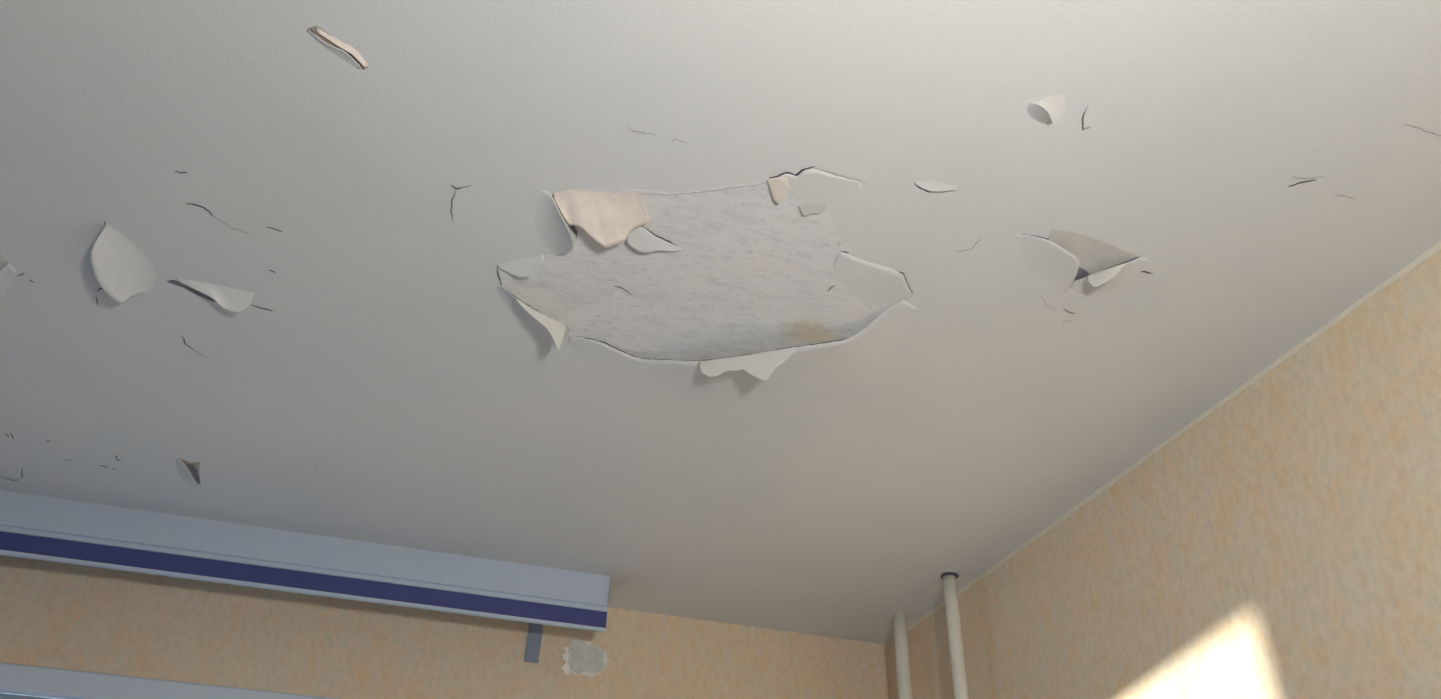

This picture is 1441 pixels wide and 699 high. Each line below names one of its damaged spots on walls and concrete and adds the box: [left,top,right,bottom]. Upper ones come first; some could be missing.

peeling [307,26,369,70]
crack [175,171,282,234]
peeling [91,221,272,313]
peeling [495,166,916,427]
peeling [1016,228,1152,299]
peeling [175,458,201,489]